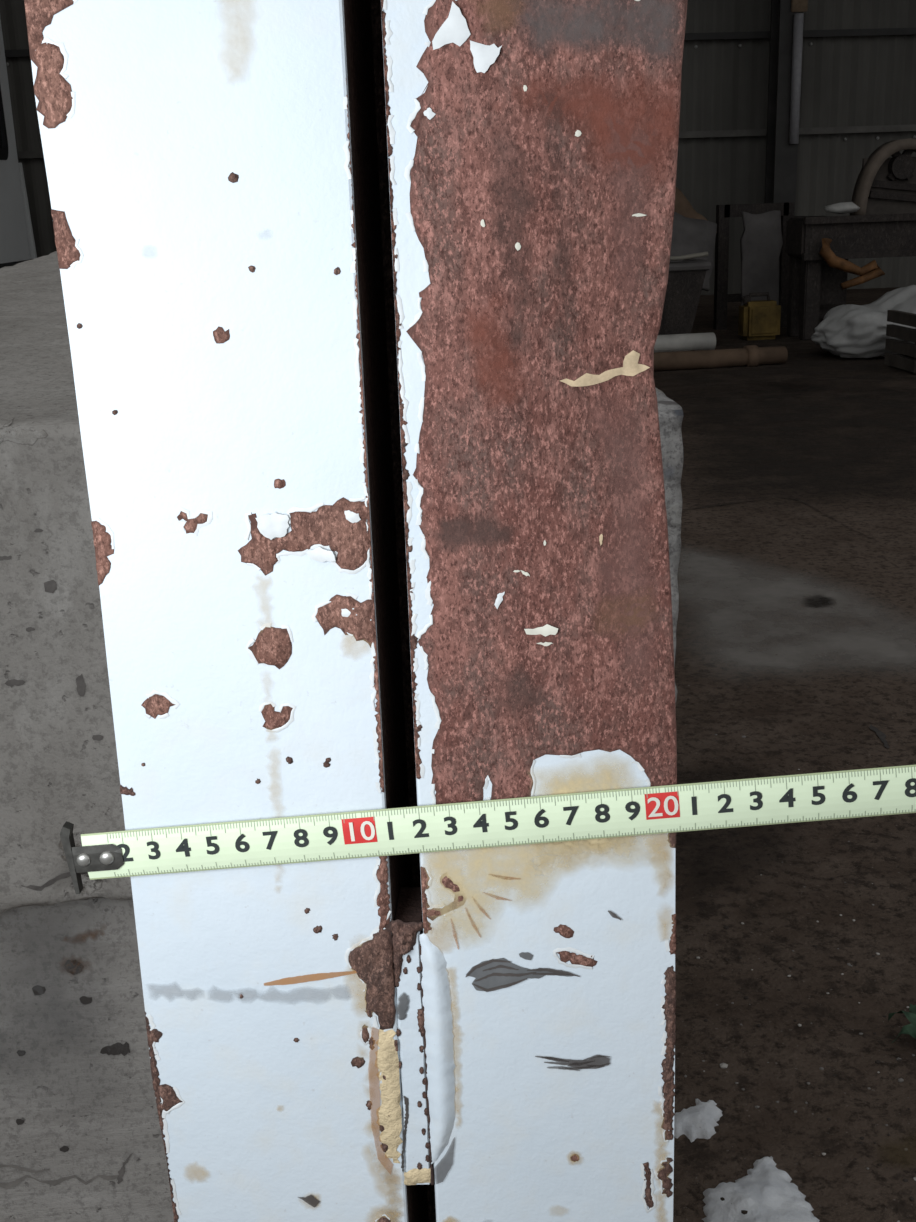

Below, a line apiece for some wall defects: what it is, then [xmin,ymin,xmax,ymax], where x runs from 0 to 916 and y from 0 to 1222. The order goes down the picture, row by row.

rust [246,623,293,669]
rust [548,768,621,795]
rust [264,856,455,1185]
rust [658,914,676,1142]
rust [145,1012,185,1222]
crack [0,1152,134,1189]
rust [640,1157,673,1213]